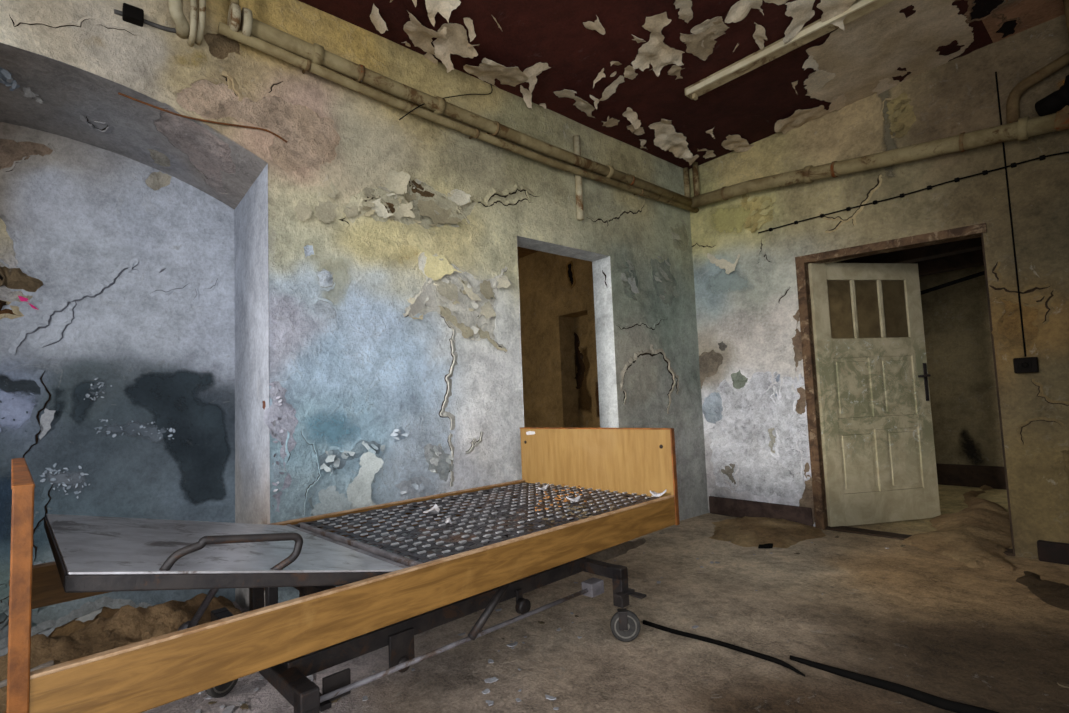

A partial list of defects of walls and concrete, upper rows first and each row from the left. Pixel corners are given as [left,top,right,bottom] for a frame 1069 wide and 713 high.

spalling [146,25,479,233]
peeling [370,4,388,34]
peeling [402,0,551,110]
peeling [553,0,1022,166]
spalling [0,213,53,319]
leakage [0,375,41,395]
leakage [54,381,99,423]
crack [8,258,221,458]
leakage [124,371,230,504]
crack [403,266,508,487]
crack [616,317,679,414]
spalling [699,305,815,527]